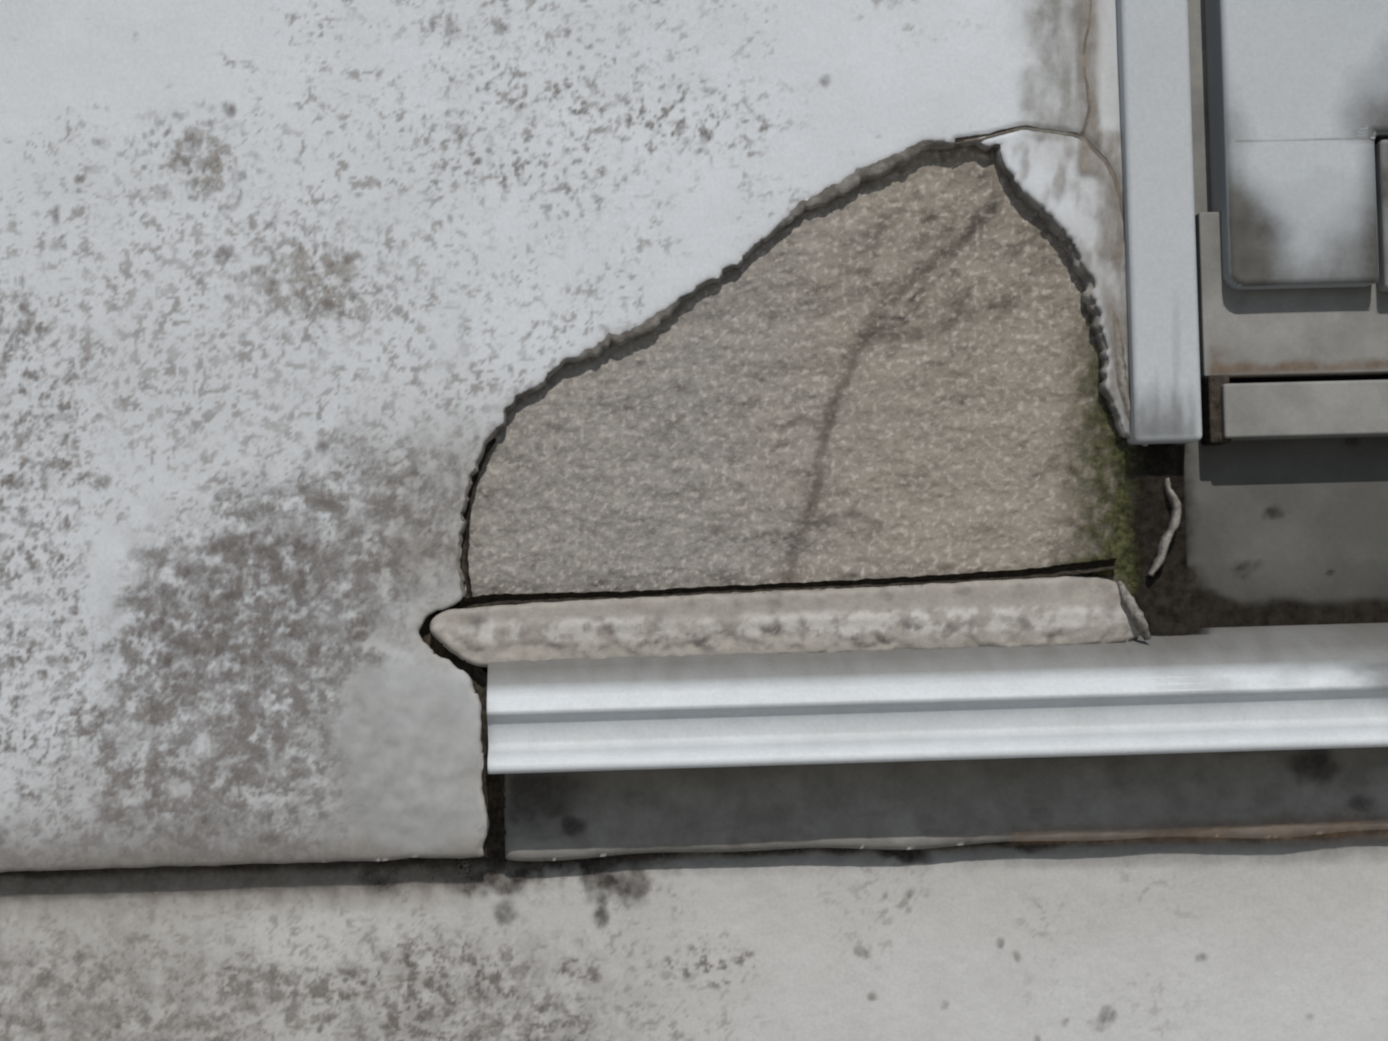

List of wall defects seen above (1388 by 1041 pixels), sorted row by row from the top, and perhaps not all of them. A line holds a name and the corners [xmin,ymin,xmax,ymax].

damp [1058,0,1124,271]
spalling [445,139,1182,640]
crack [419,438,1117,858]